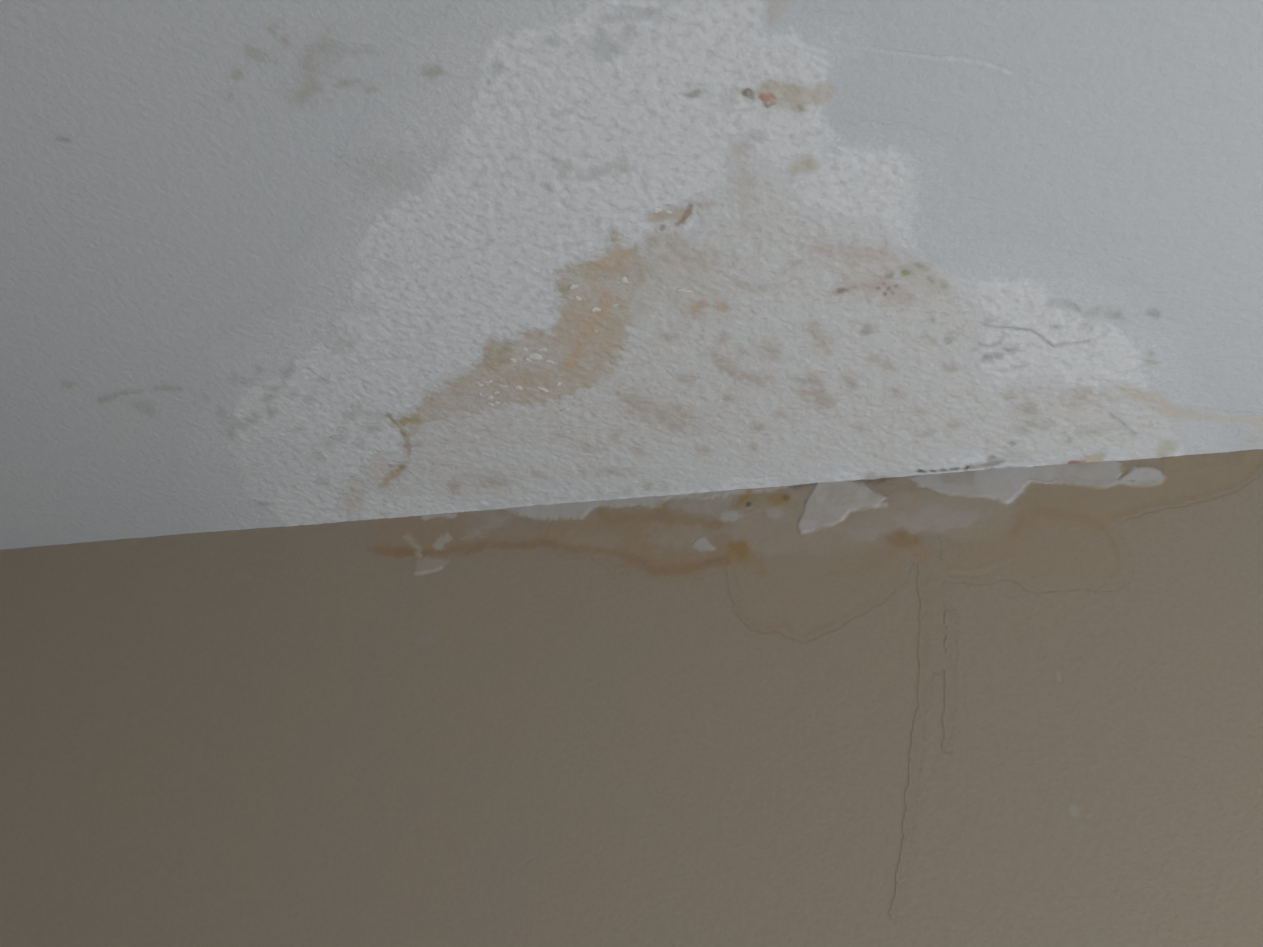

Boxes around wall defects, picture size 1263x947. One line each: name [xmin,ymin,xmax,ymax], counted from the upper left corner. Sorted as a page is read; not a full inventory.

flaking render [169,0,1240,533]
water stain [364,135,1263,594]